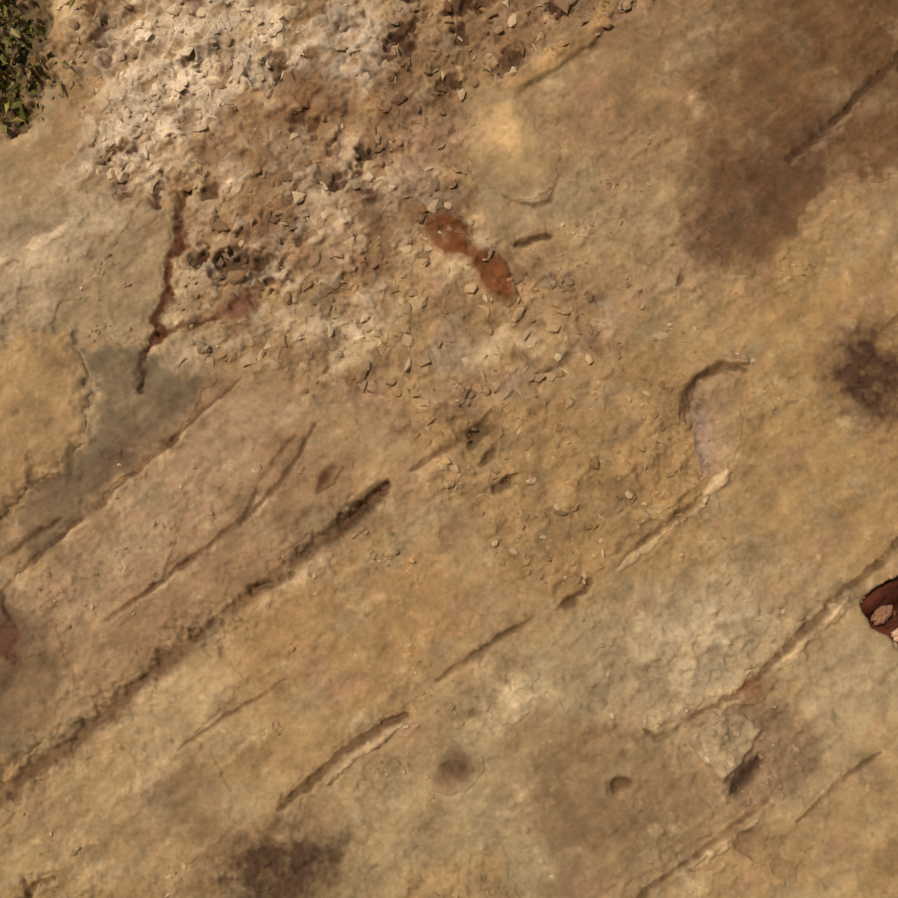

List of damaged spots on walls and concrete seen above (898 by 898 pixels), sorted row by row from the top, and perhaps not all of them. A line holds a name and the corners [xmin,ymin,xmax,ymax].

crack [141,171,218,352]
damp [0,0,442,570]
rust [403,201,520,308]
crack [537,339,580,387]
damp [0,577,76,783]
crack [66,375,243,538]
crack [0,410,494,814]
crack [434,612,540,683]
crack [606,492,710,576]
spalling [859,594,893,629]